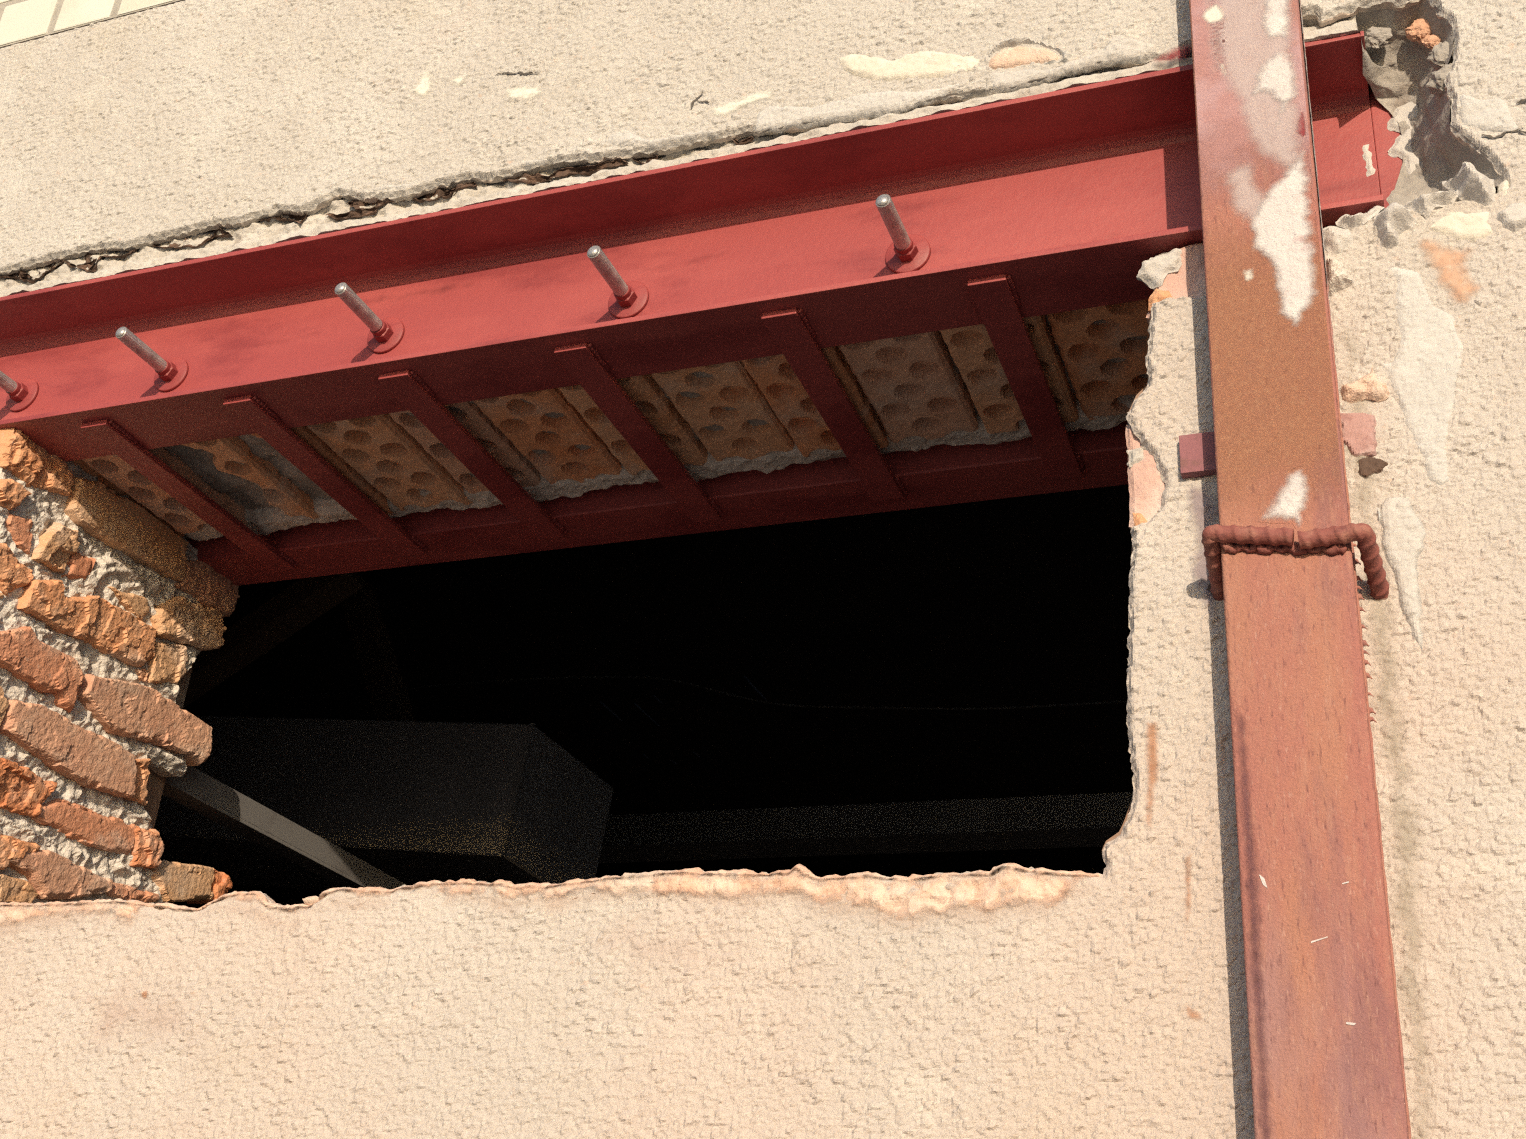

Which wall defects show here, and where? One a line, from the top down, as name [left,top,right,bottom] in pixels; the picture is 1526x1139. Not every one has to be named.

crack [496,69,537,77]
crack [733,116,844,145]
crack [914,76,1049,105]
rust [1191,0,1269,179]
rust [1284,0,1310,152]
spalling [1303,0,1509,206]
crack [0,154,658,284]
flaking render [1430,212,1493,243]
rust [1207,260,1339,470]
spalling [1125,425,1165,530]
spalling [0,863,1100,923]